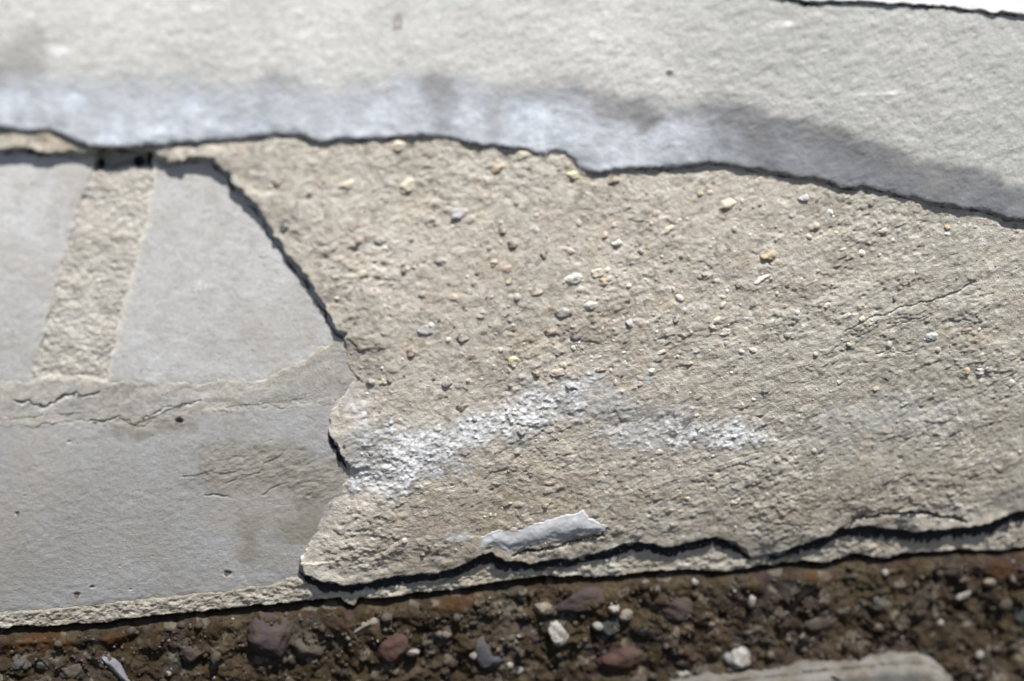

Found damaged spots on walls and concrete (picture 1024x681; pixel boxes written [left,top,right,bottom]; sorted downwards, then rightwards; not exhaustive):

crack [12,393,192,424]
water stain [341,371,767,498]
spalling [184,442,339,502]